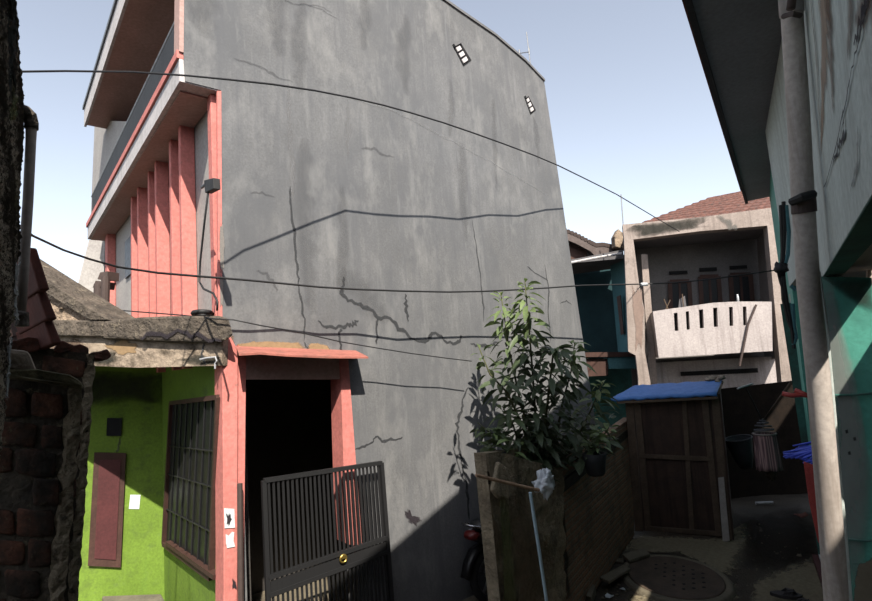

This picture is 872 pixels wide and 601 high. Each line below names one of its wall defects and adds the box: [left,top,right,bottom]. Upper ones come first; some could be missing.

water stain [819,0,829,145]
crack [289,189,498,350]
crack [355,436,402,450]
crack [455,388,470,519]